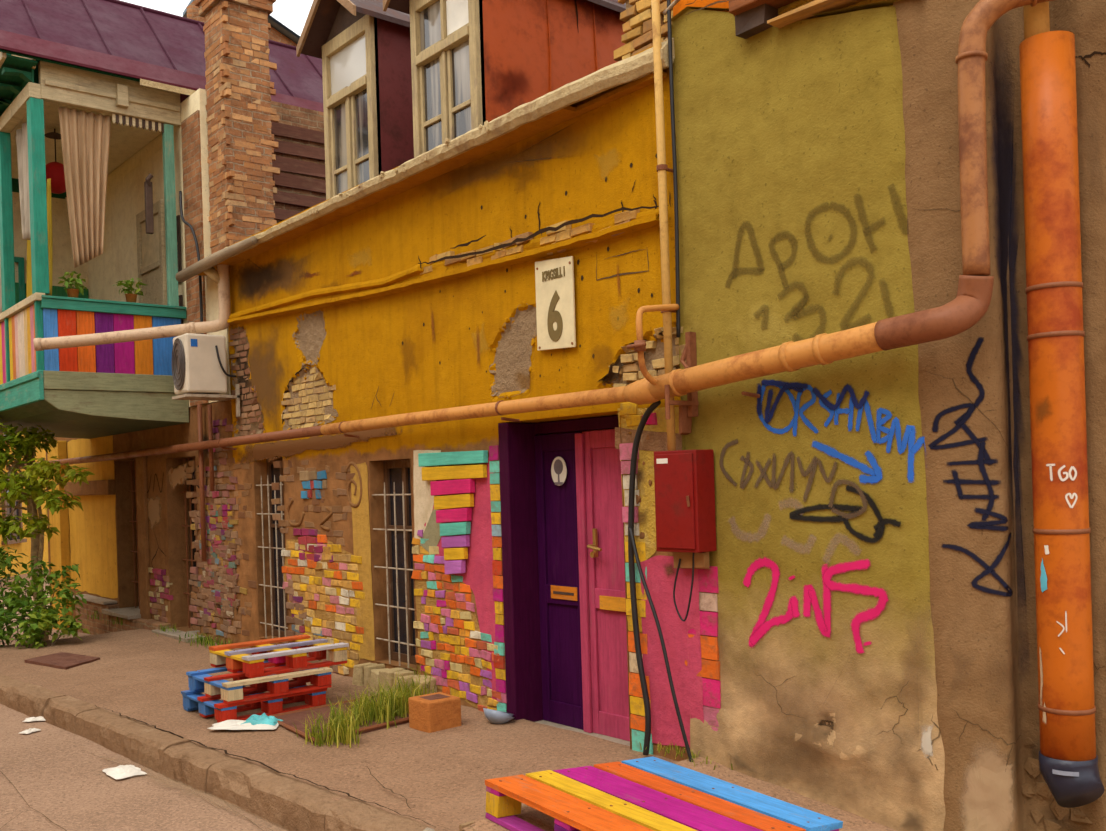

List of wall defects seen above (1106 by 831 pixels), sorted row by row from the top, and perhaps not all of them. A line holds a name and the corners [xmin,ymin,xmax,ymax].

crack [418,180,671,270]
crack [596,249,649,281]
peeling [486,301,541,399]
spalling [599,323,686,389]
flaking render [169,309,402,649]
crack [875,681,1021,772]